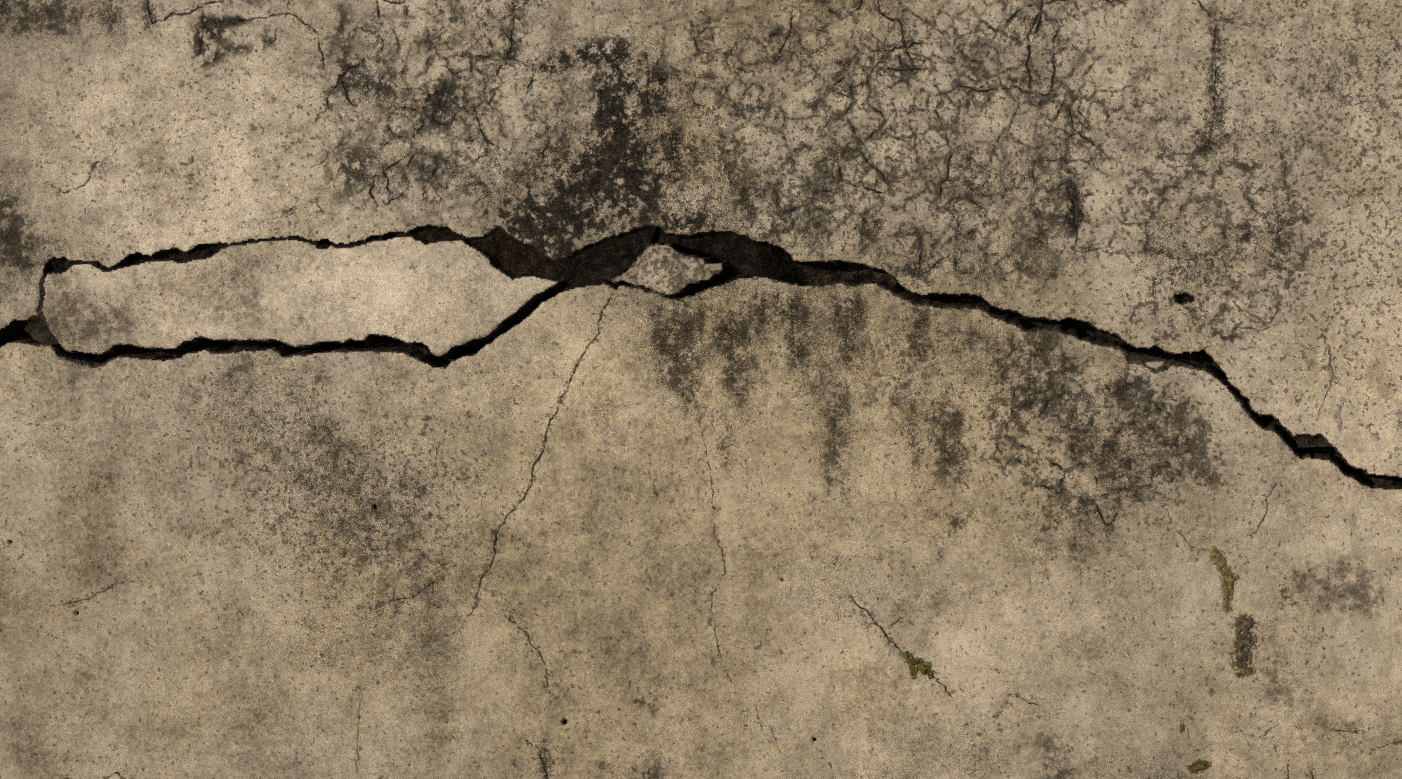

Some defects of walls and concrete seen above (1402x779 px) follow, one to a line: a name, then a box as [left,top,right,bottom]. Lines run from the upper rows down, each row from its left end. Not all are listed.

crack [0,0,567,369]
water stain [338,152,369,190]
water stain [335,11,391,98]
water stain [416,81,458,126]
water stain [483,38,718,260]
crack [687,0,1402,550]
crack [465,225,731,620]
water stain [650,296,809,403]
water stain [909,403,967,483]
water stain [996,331,1088,415]
water stain [1108,383,1224,485]
crack [508,618,548,686]